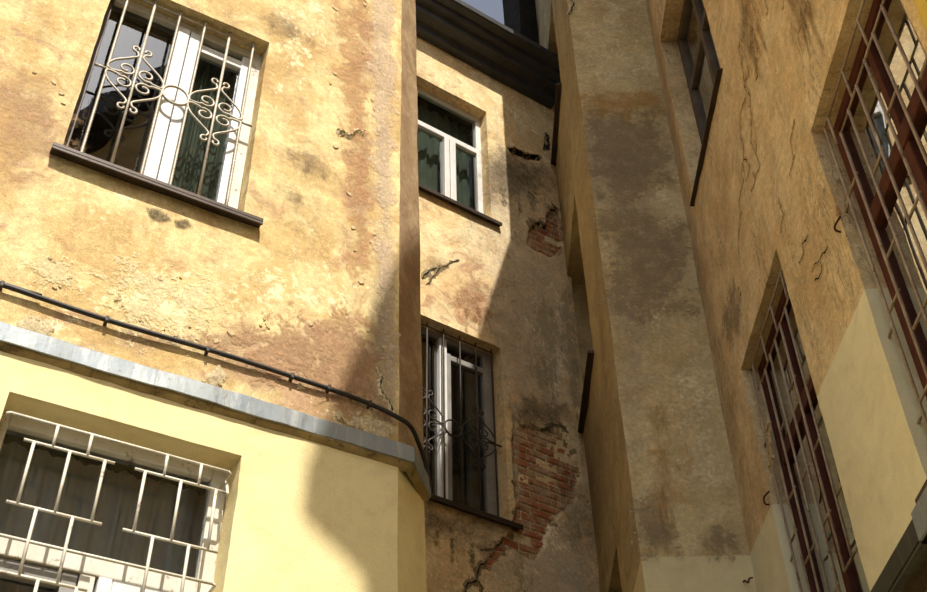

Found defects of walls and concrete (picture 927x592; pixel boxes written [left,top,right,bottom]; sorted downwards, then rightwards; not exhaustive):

peeling [329,0,379,284]
crack [737,0,807,259]
flaking render [526,202,564,257]
crack [798,234,829,283]
crack [375,367,397,411]
flaking render [484,401,580,570]
crack [458,536,505,592]